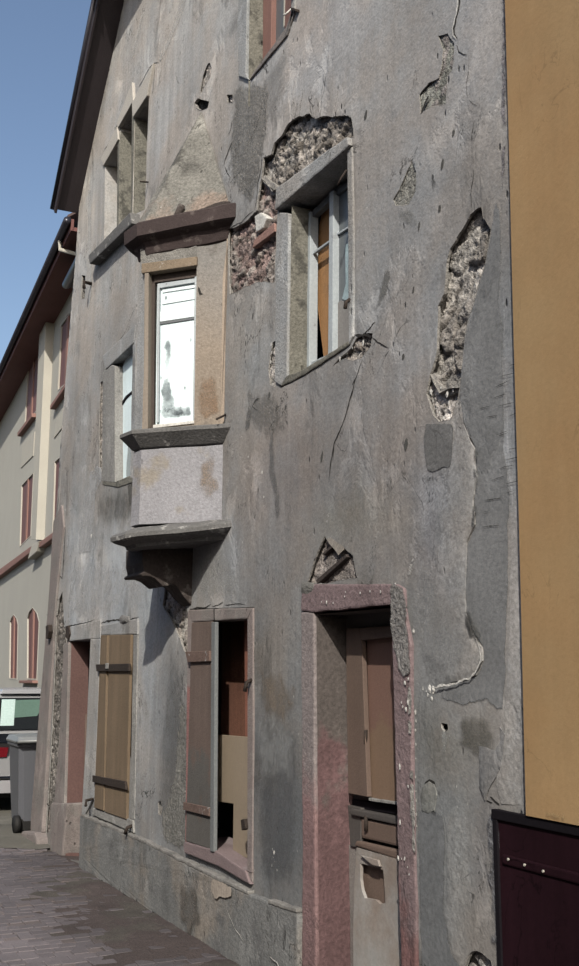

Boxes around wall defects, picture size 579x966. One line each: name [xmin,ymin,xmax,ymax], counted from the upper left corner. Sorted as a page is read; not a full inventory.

flaking render [419,33,454,114]
crack [452,0,477,142]
flaking render [227,84,354,294]
flaking render [393,161,416,206]
crack [329,322,388,476]
peeling [360,207,491,746]
flaking render [163,589,196,654]
flaking render [308,536,357,597]
spalling [397,764,417,875]
peeling [444,806,492,966]
peeling [487,816,499,911]